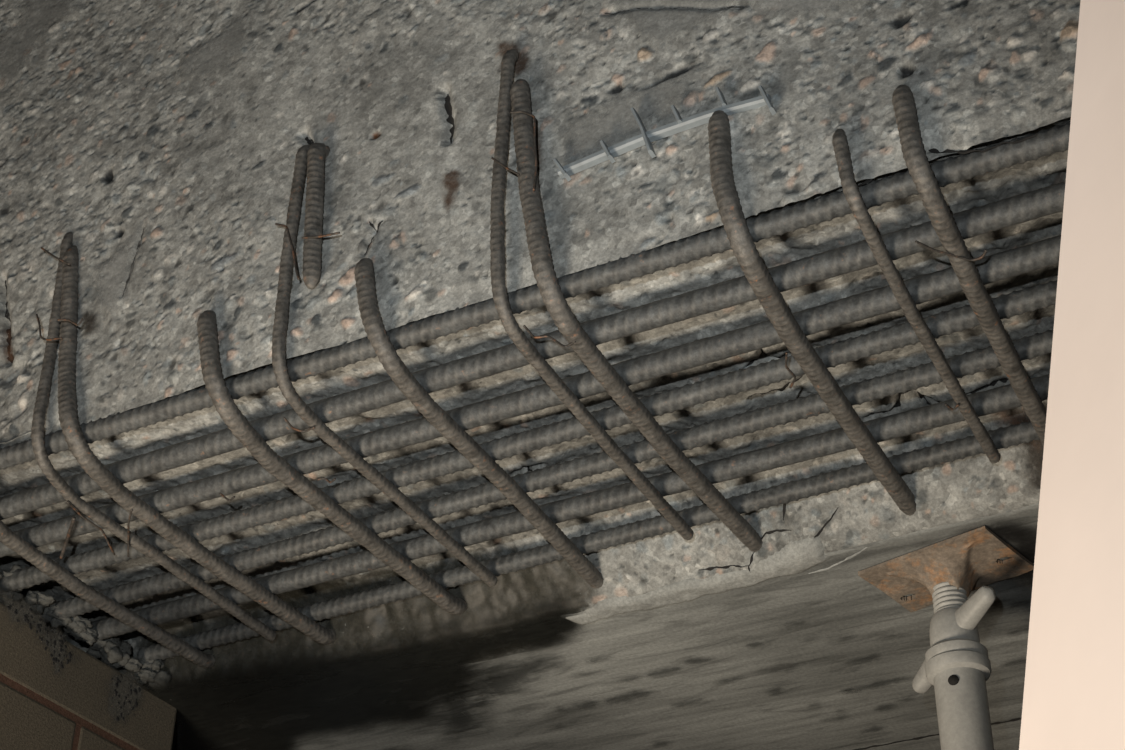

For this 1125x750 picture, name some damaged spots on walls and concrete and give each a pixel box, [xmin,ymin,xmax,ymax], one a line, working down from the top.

corrosion [499,44,527,74]
corrosion [444,171,458,206]
spalling [0,0,1081,448]
spalling [88,406,228,466]
spalling [124,447,258,496]
spalling [266,400,423,457]
spalling [495,423,646,477]
spalling [878,406,1030,457]
corrosion [1025,440,1044,488]
spalling [411,529,551,570]
spalling [556,490,704,539]
spalling [580,443,1040,610]